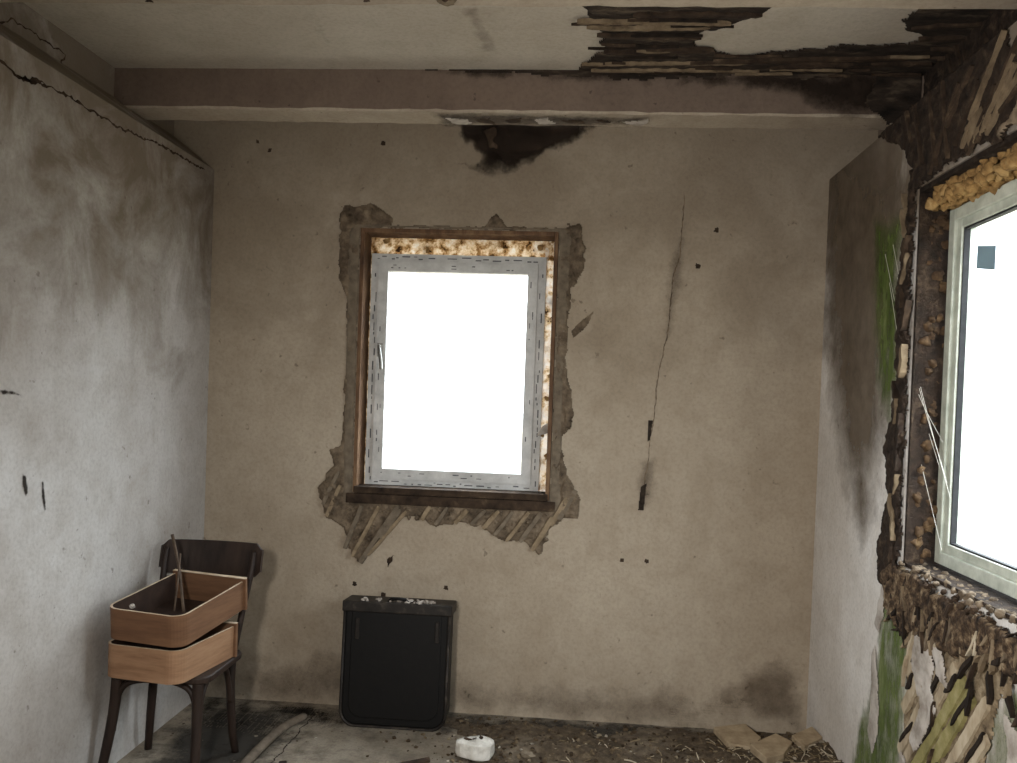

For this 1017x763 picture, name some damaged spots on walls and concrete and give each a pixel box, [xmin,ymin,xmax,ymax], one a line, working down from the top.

crack [0,17,66,63]
crack [0,59,205,170]
leakage [462,124,584,171]
flaking render [878,9,1017,234]
flaking render [318,202,593,564]
flaking render [874,563,1017,763]